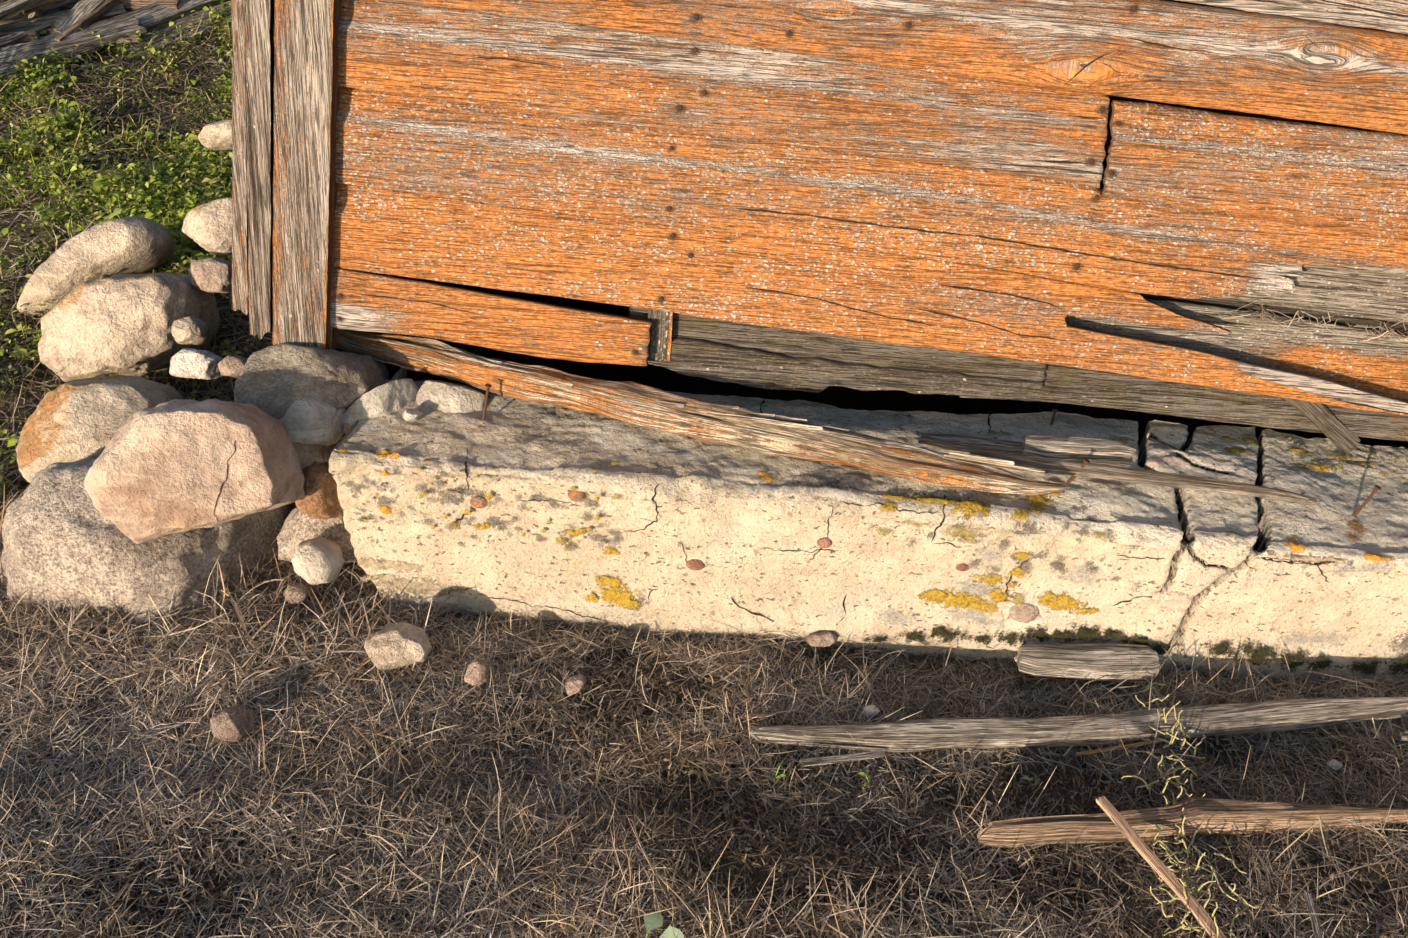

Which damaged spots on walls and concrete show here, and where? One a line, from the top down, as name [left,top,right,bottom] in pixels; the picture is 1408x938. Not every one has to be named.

crack [1113,426,1335,637]